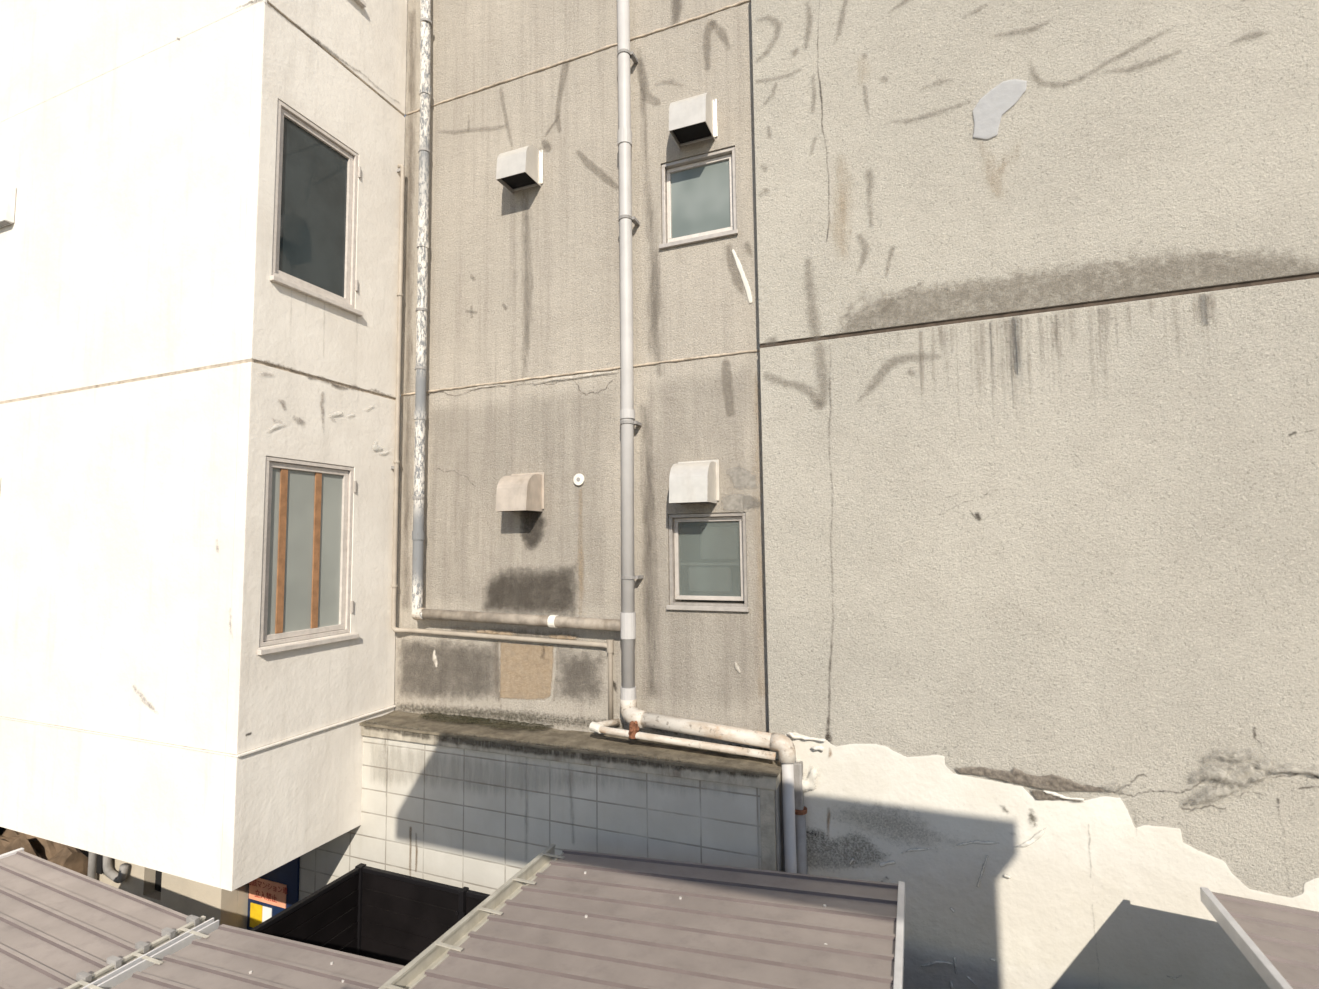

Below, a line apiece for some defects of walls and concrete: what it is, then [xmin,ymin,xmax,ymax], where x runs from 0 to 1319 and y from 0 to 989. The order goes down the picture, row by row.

leakage [400,643,595,726]
leakage [364,721,759,777]
peeling [786,732,825,751]
spalling [955,767,1125,802]
spalling [1187,750,1272,804]